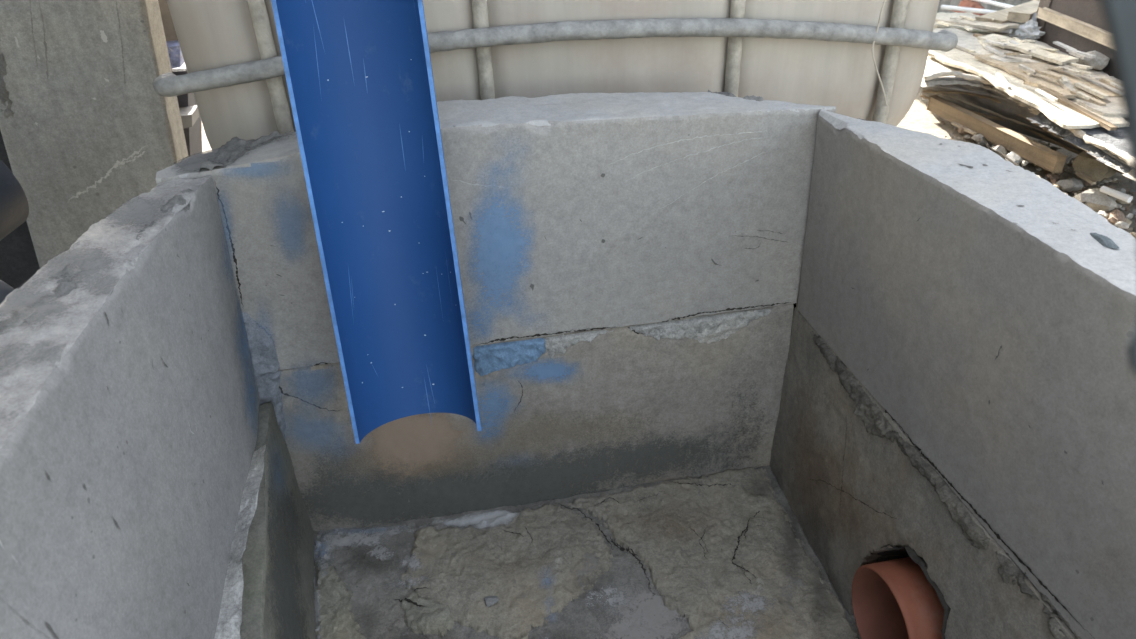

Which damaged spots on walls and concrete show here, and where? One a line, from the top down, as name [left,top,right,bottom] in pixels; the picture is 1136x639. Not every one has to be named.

crack [215,183,243,305]
spalling [242,312,286,440]
spalling [473,330,614,377]
spalling [629,308,771,344]
crack [562,482,731,596]
crack [689,511,760,586]
crack [885,410,1095,639]